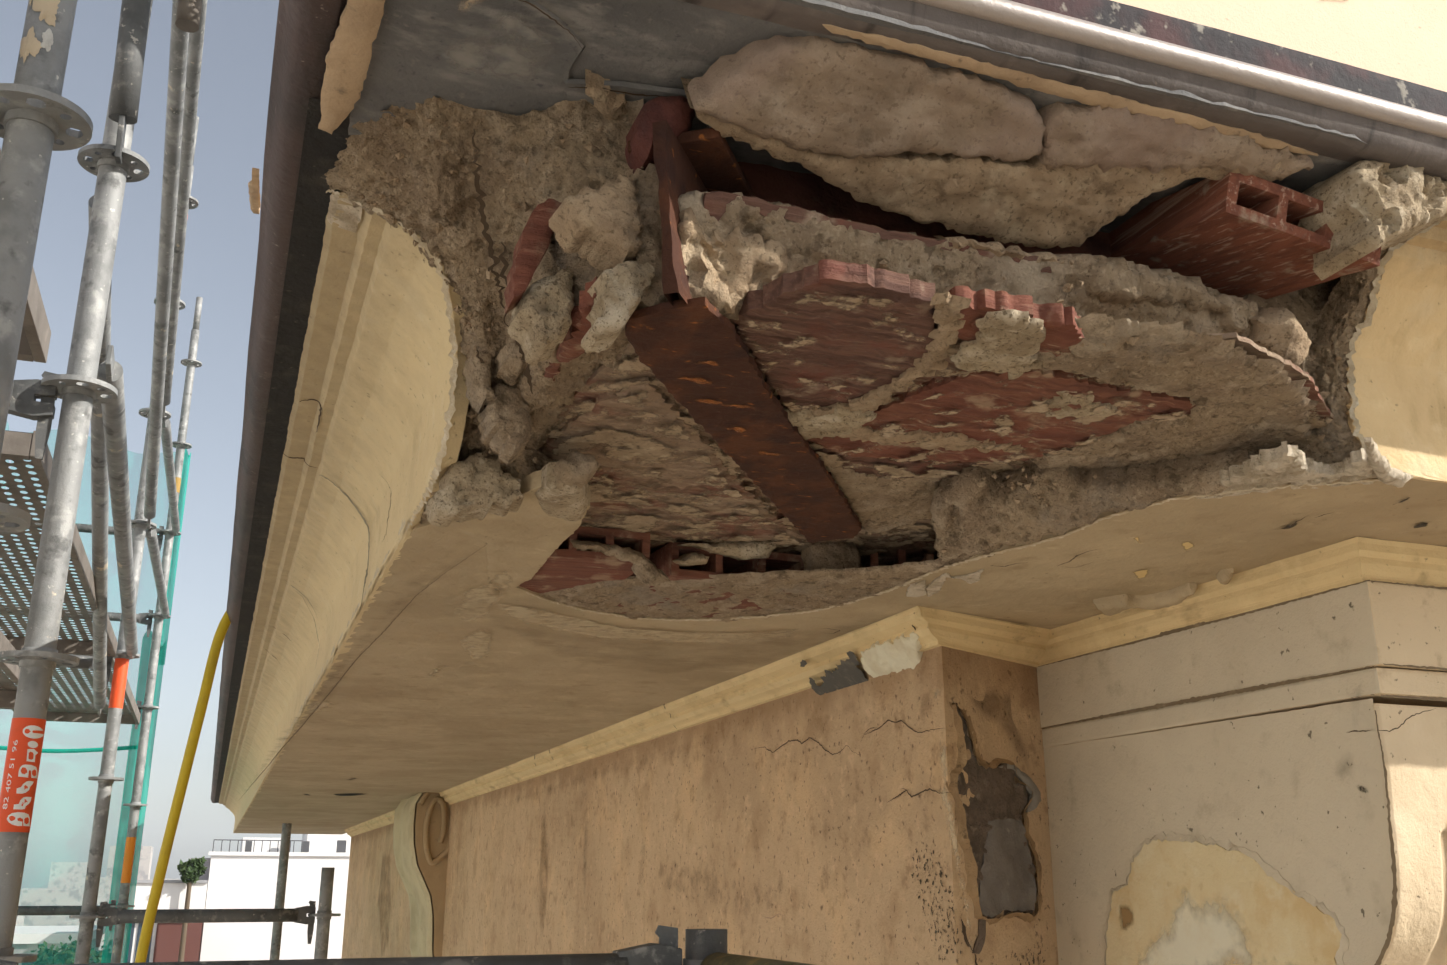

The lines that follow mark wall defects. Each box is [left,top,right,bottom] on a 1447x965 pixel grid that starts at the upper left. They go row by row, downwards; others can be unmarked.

spalling [324,35,1447,623]
peeling [800,651,869,695]
crack [754,720,945,755]
crack [890,788,952,801]
spalling [945,700,1042,954]
peeling [1101,831,1349,965]